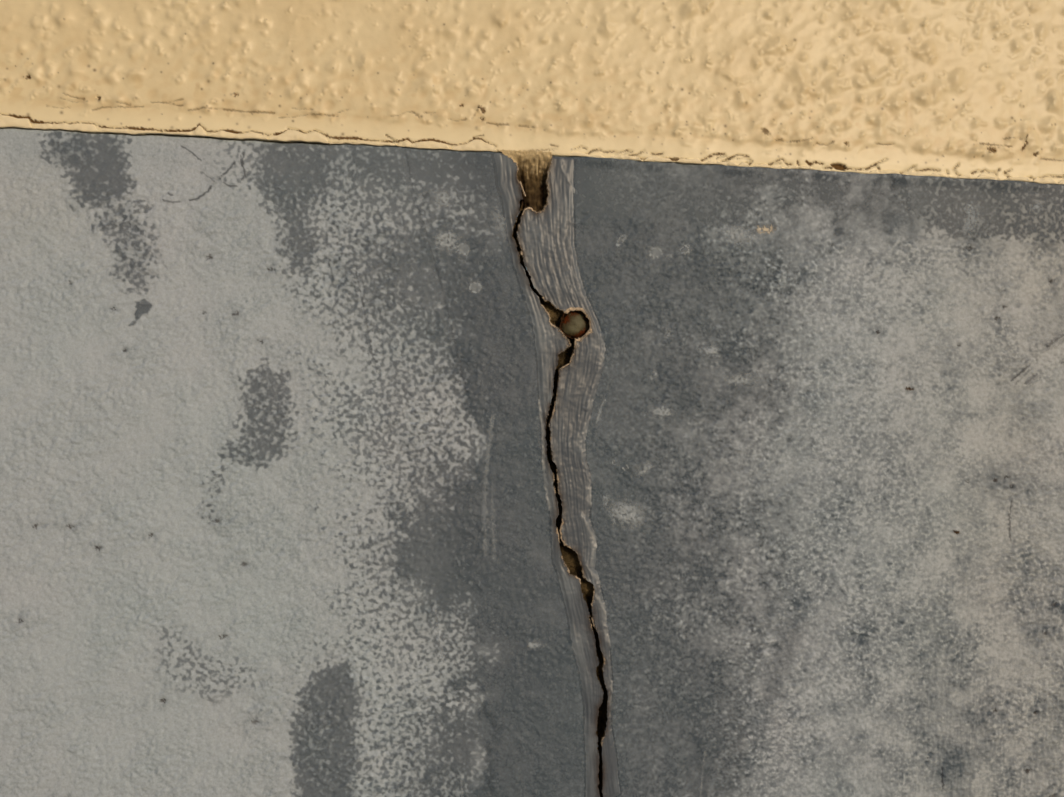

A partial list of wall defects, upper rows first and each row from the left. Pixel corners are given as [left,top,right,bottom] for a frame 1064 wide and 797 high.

water stain [49,132,130,217]
spalling [498,150,552,215]
water stain [115,229,147,278]
water stain [222,371,289,465]
water stain [258,142,586,797]
crack [512,183,608,797]
water stain [551,156,1064,797]